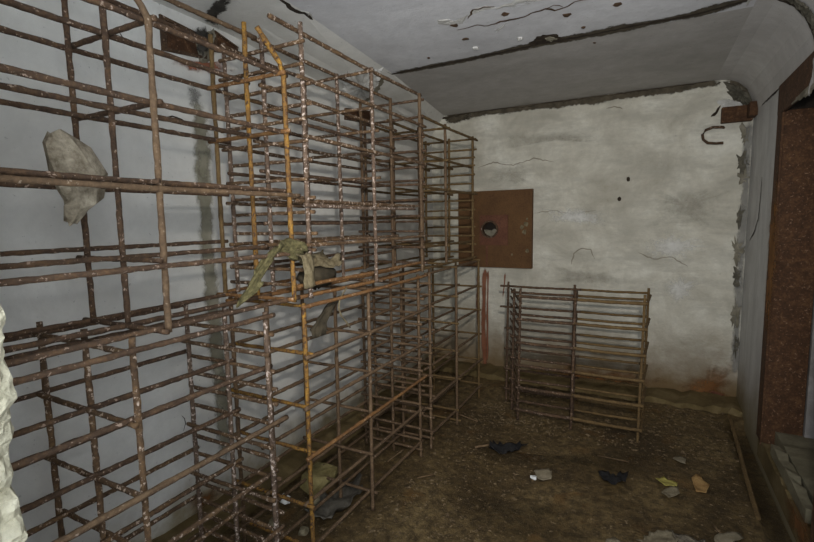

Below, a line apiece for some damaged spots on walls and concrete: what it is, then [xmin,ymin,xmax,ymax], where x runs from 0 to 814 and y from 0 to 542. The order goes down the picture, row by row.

water stain [193,0,230,55]
crack [280,0,313,20]
crack [459,0,582,30]
spalling [529,34,569,45]
spalling [778,0,814,39]
spalling [716,80,752,108]
peeling [791,58,814,104]
peeling [730,122,753,372]
rust [765,201,777,326]
rust [476,270,489,364]